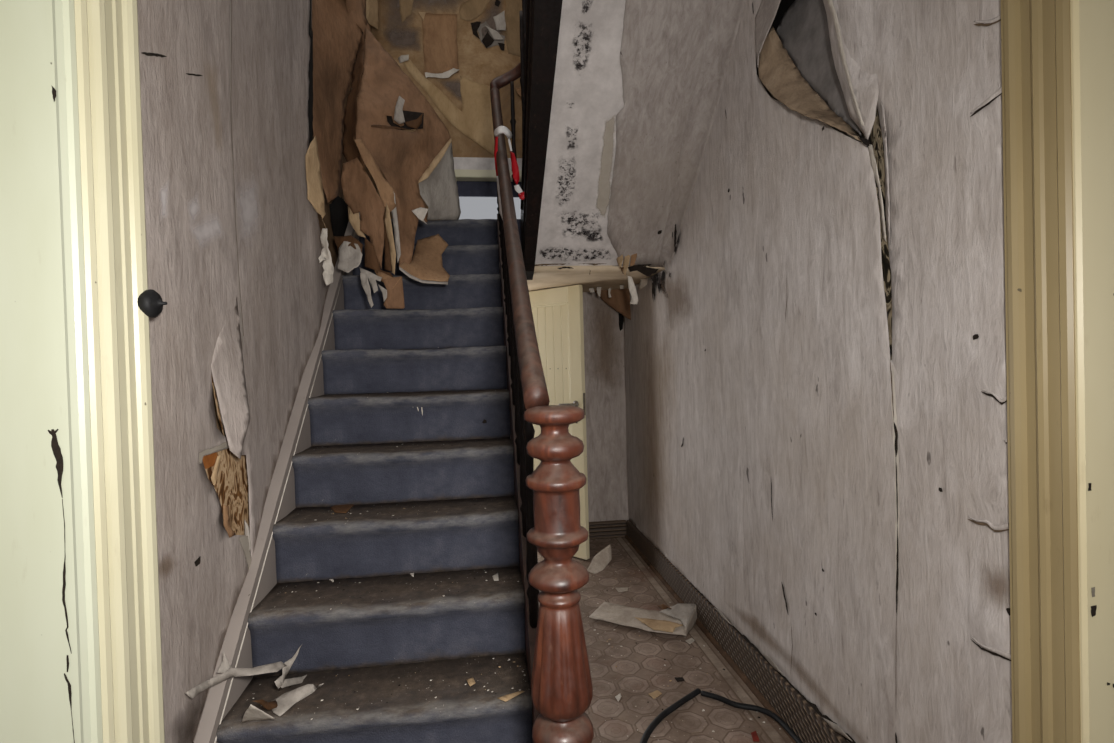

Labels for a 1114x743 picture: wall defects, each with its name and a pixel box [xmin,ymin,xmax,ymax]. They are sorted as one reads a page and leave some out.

peeling [471,0,522,56]
leakage [574,0,591,70]
peeling [403,59,495,155]
spalling [329,196,349,248]
leakage [540,129,609,261]
crack [890,362,900,623]
crack [48,429,75,743]